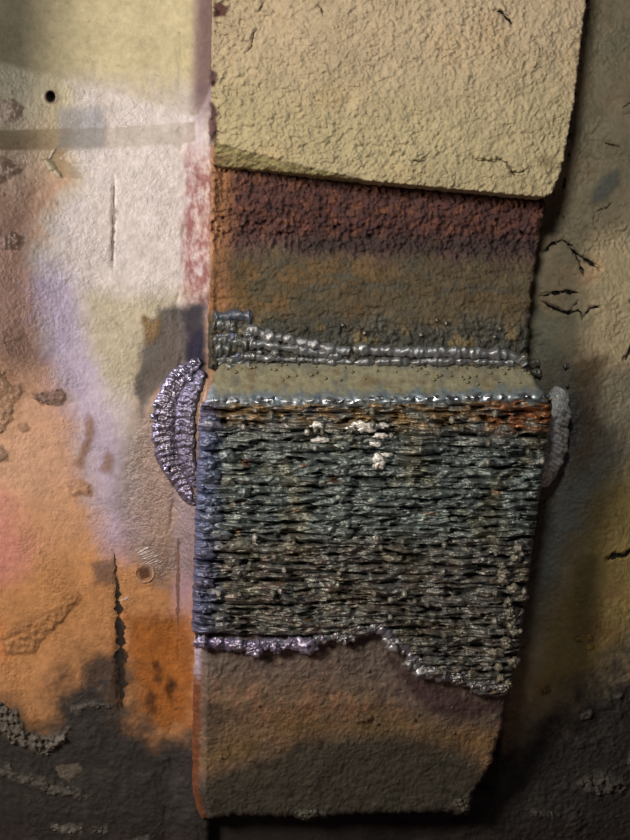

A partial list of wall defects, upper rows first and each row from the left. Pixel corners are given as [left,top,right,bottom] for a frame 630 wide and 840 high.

crack [540,240,601,316]